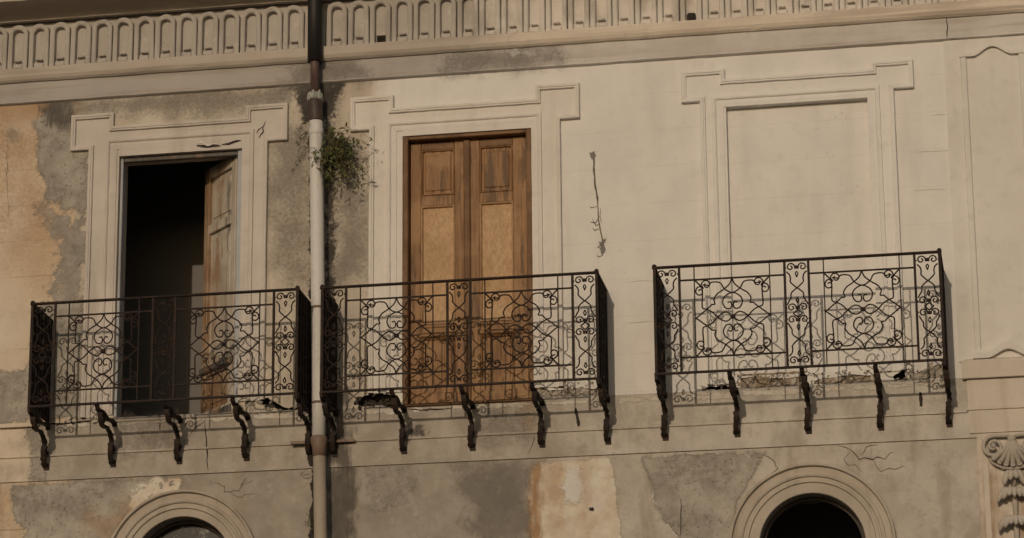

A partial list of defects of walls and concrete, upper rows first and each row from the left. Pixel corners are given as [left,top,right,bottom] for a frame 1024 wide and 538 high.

flaking render [0,101,114,481]
spalling [537,381,599,400]
spalling [701,370,874,393]
spalling [893,361,944,383]
spalling [245,397,308,415]
crack [185,421,254,498]
crack [842,444,903,472]
flaking render [127,476,182,510]